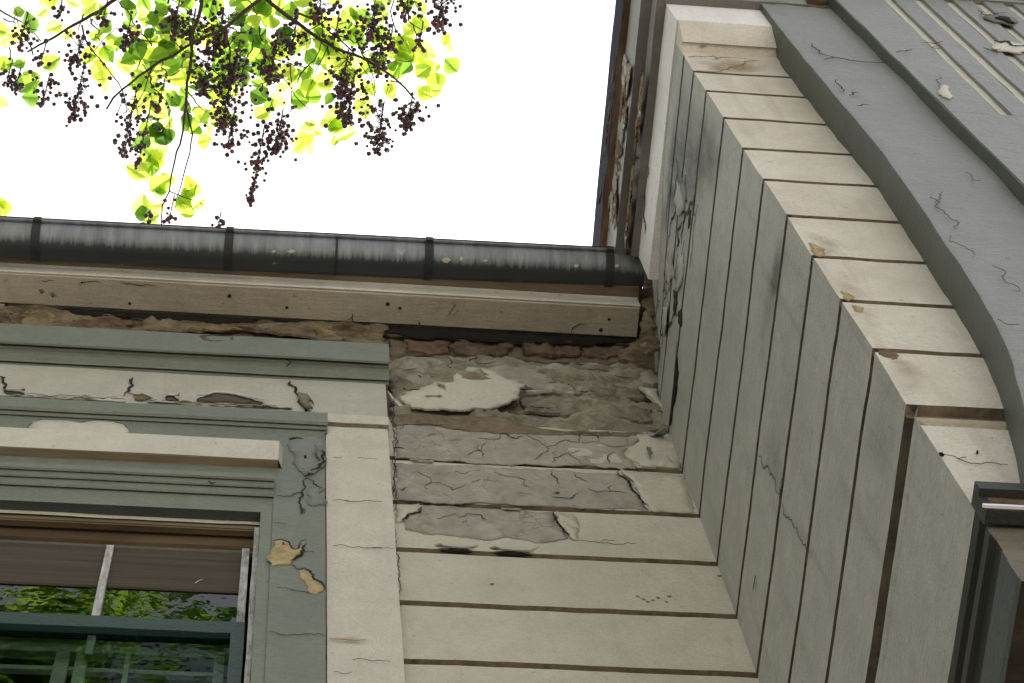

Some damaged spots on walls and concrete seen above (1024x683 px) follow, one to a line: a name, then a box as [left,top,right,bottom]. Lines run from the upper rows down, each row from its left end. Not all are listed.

crack [811,41,943,106]
peeling [936,76,953,99]
flaking render [978,10,1018,26]
flaking render [991,40,1024,54]
peeling [598,53,645,256]
crack [930,192,1020,292]
flaking render [0,159,698,543]
crack [275,387,402,611]
crack [759,456,809,560]
peeling [267,539,326,595]